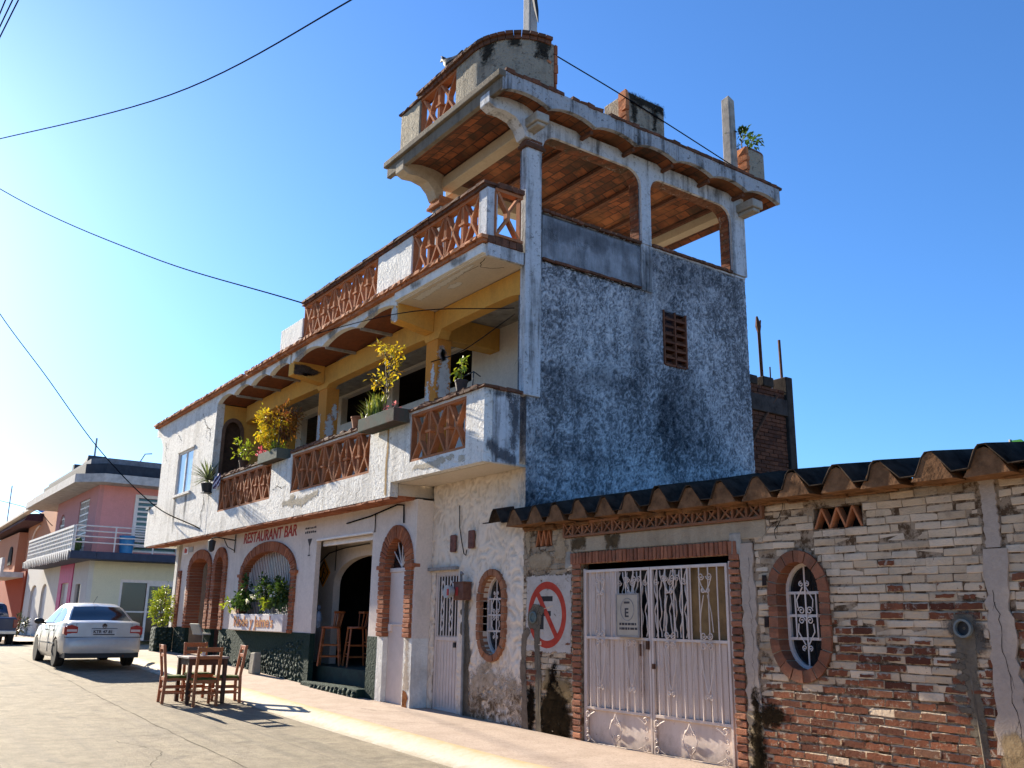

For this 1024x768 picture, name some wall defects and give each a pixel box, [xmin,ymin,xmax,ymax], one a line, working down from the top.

damp [480,42,495,65]
damp [534,41,552,59]
peeling [423,346,450,403]
flaking render [1012,572,1024,589]
damp [945,611,986,654]
damp [527,661,573,738]
flaking render [762,585,1024,768]
crack [992,590,1023,741]